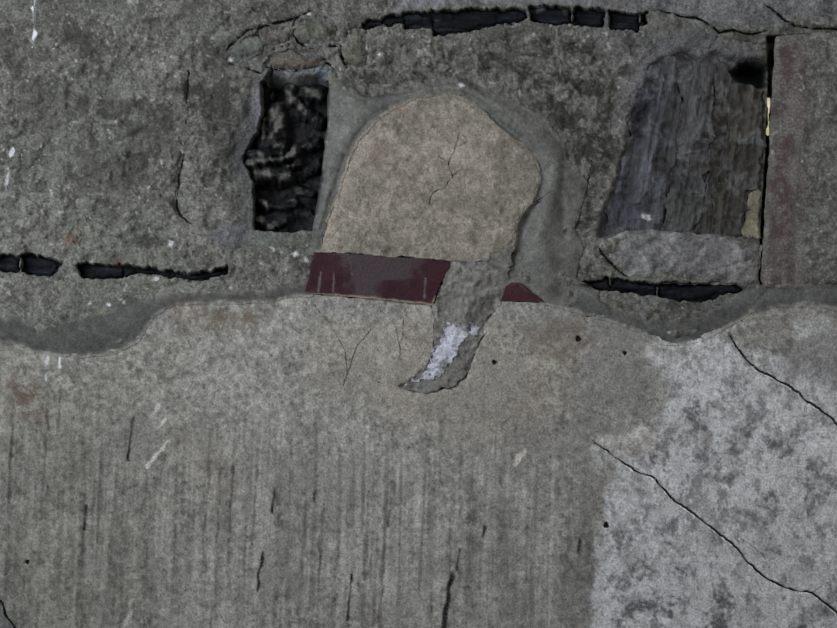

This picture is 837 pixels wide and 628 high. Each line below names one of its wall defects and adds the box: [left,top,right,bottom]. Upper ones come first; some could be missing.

crack [653,5,837,42]
spalling [403,245,515,394]
crack [730,335,837,426]
crack [594,442,837,615]
crack [0,600,16,628]